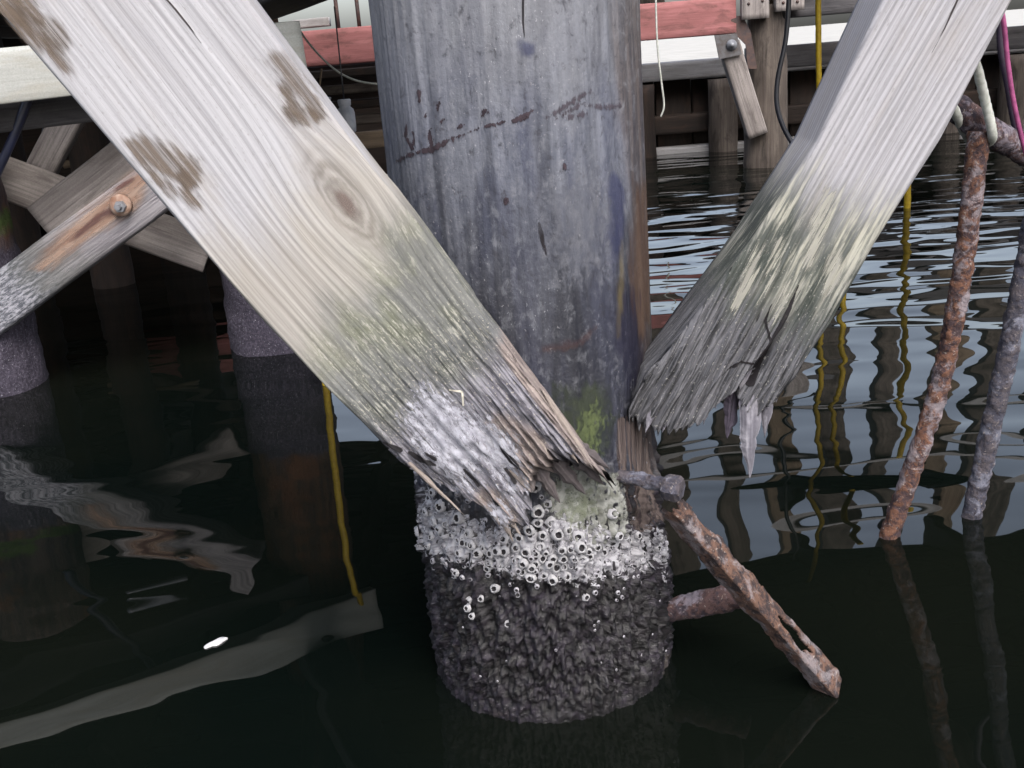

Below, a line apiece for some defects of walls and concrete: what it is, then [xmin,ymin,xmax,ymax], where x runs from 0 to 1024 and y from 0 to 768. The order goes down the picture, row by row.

damp [269,53,325,126]
damp [125,135,201,208]
crack [722,285,799,387]